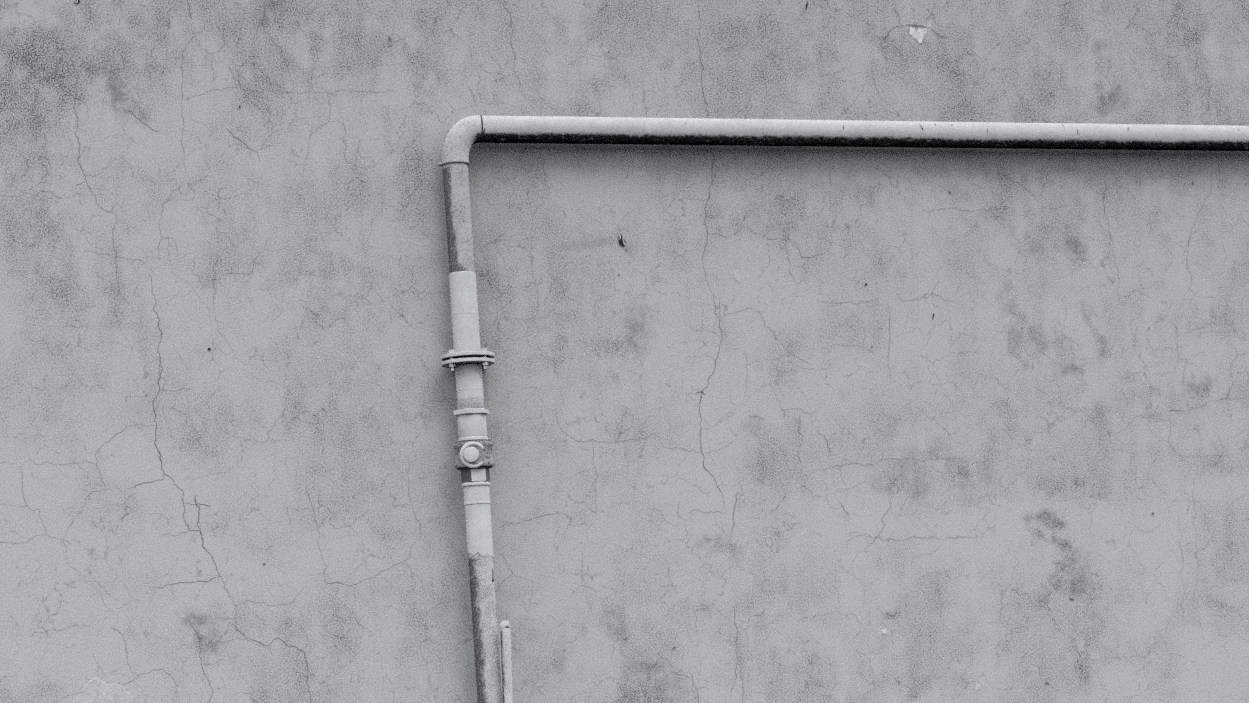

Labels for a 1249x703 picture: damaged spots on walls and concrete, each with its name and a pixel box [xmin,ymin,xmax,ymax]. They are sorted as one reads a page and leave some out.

crack [0,3,314,701]
crack [306,462,425,592]
crack [556,8,984,549]
spalling [877,3,943,60]